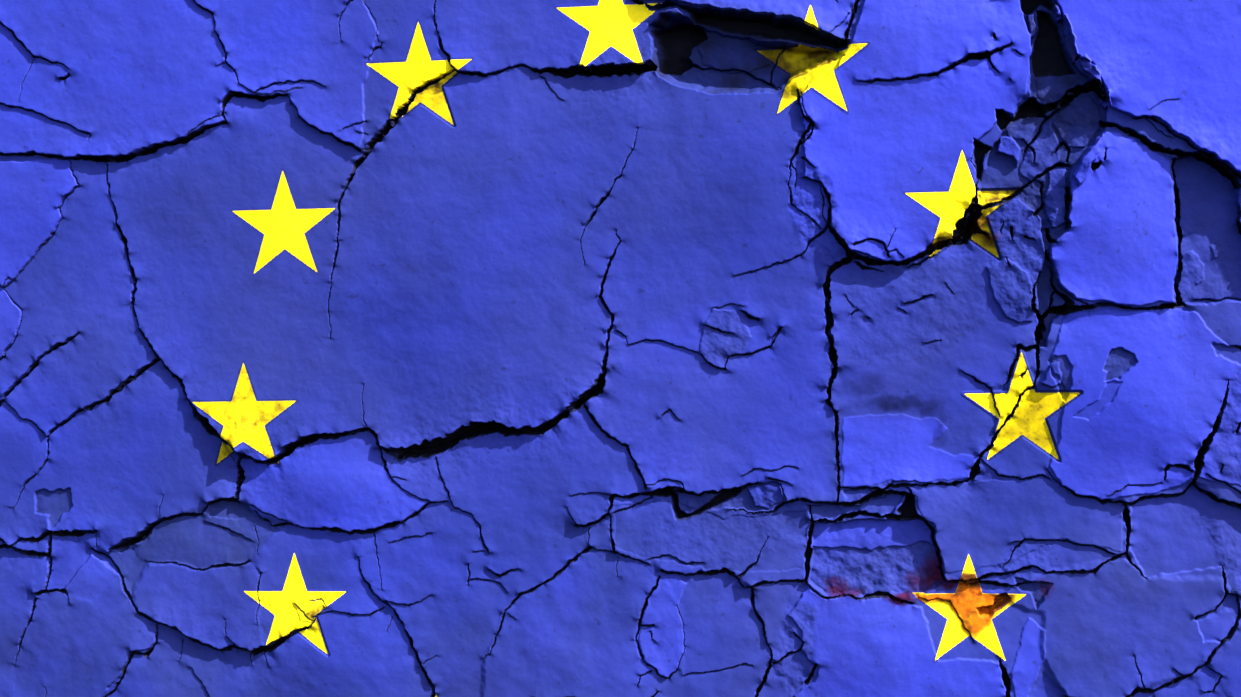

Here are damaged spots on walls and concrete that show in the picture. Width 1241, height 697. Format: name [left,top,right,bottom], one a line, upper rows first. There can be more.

crack [692,44,786,91]
peeling [644,0,851,94]
crack [830,0,860,43]
crack [857,42,1013,84]
crack [0,0,658,361]
spalling [973,0,1111,393]
peeling [1173,156,1241,305]
crack [636,79,1241,697]
peeling [1103,348,1137,381]
crack [0,178,782,697]
rust [830,580,863,596]
rust [890,559,1013,636]